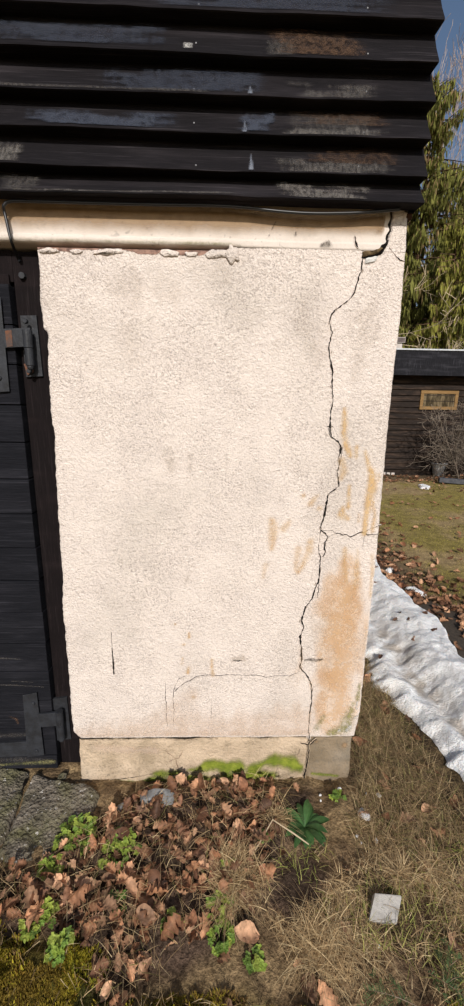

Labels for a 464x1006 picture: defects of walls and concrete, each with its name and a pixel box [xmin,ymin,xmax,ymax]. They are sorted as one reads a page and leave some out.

flaking render [37,247,227,259]
crack [165,236,382,778]
crack [109,751,205,780]